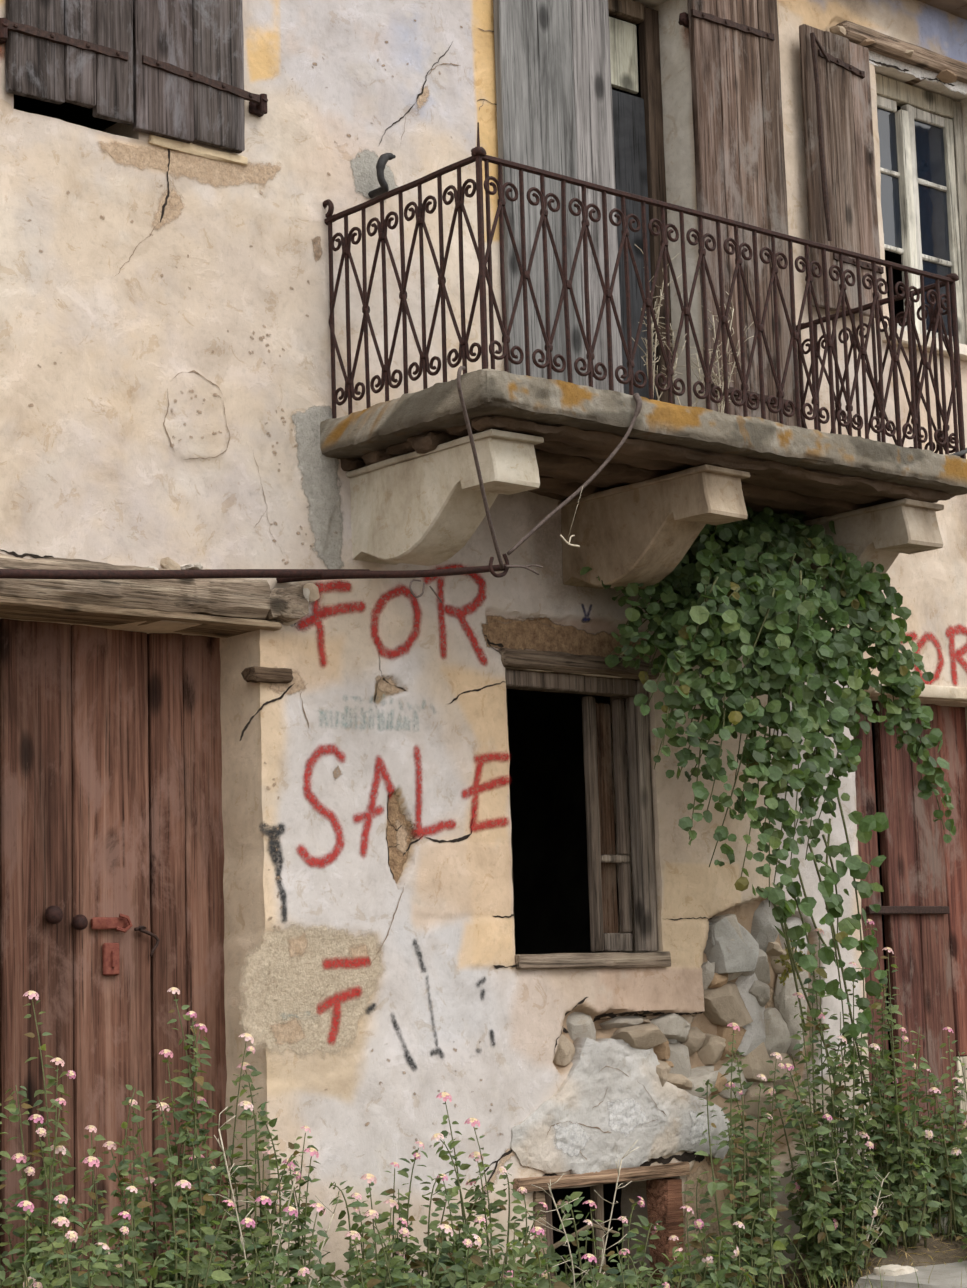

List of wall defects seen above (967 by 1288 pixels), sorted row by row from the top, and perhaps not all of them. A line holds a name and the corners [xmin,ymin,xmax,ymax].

crack [379,41,461,144]
crack [114,149,184,277]
crack [240,667,309,741]
crack [449,642,504,704]
peeling [386,794,407,879]
peeling [350,945,368,960]
crack [368,887,404,969]